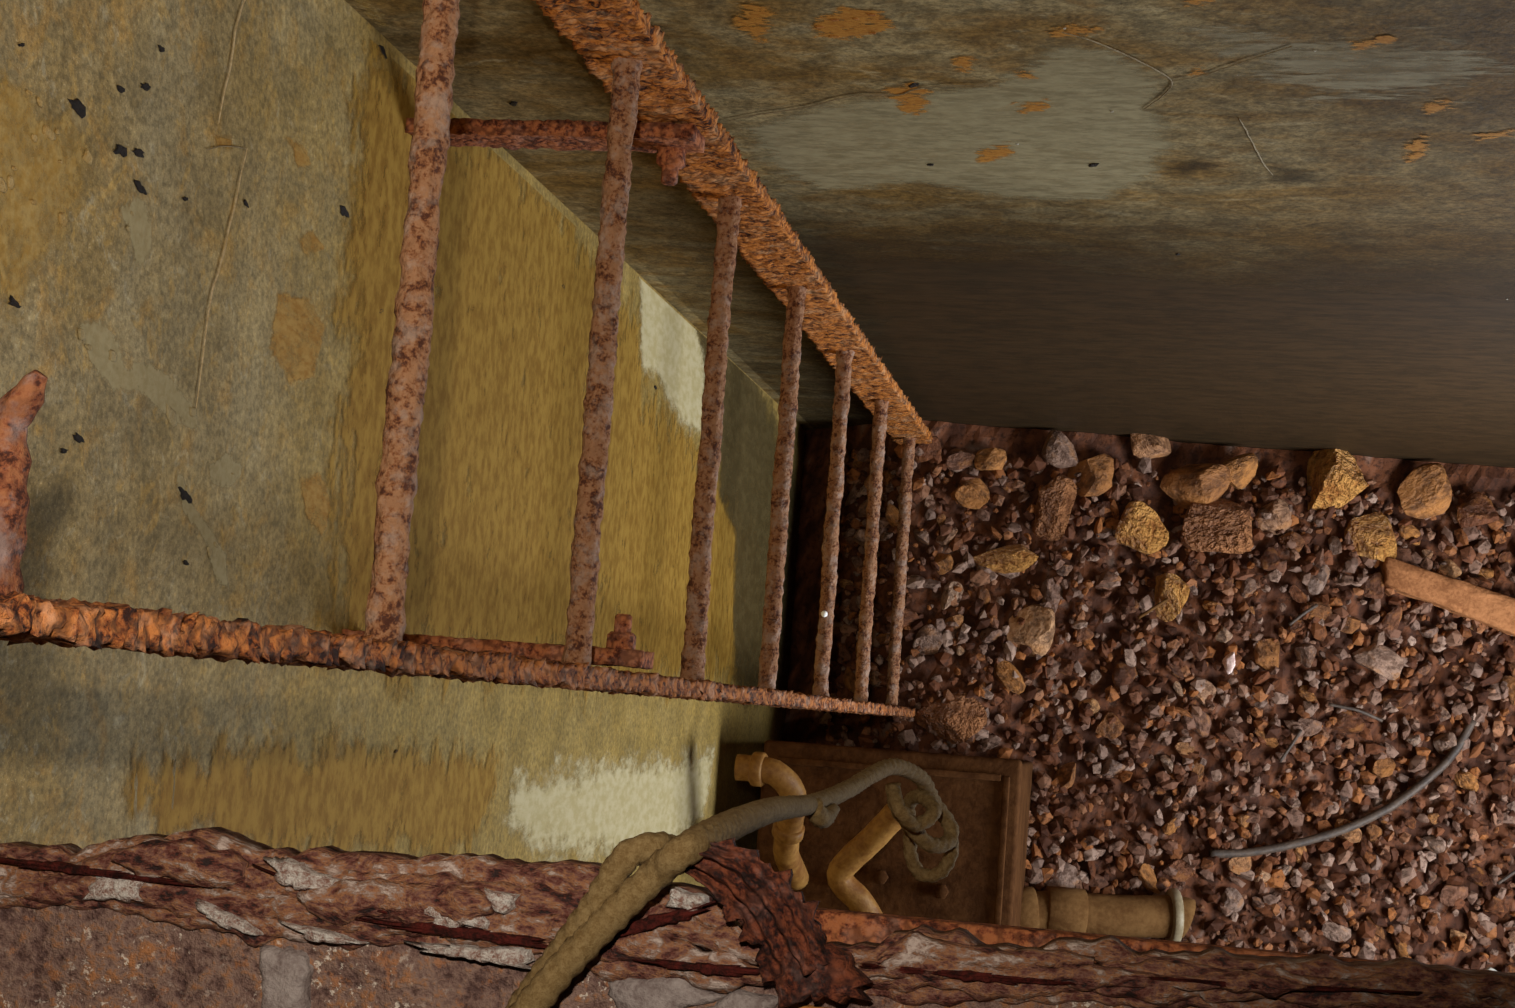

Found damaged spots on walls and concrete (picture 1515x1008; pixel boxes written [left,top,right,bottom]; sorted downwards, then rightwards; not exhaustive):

rust [732,2,778,44]
rust [811,7,895,41]
rust [881,82,934,115]
rust [975,145,1015,163]
rust [0,773,602,1008]
rust [585,882,829,1008]
rust [826,924,1515,1008]